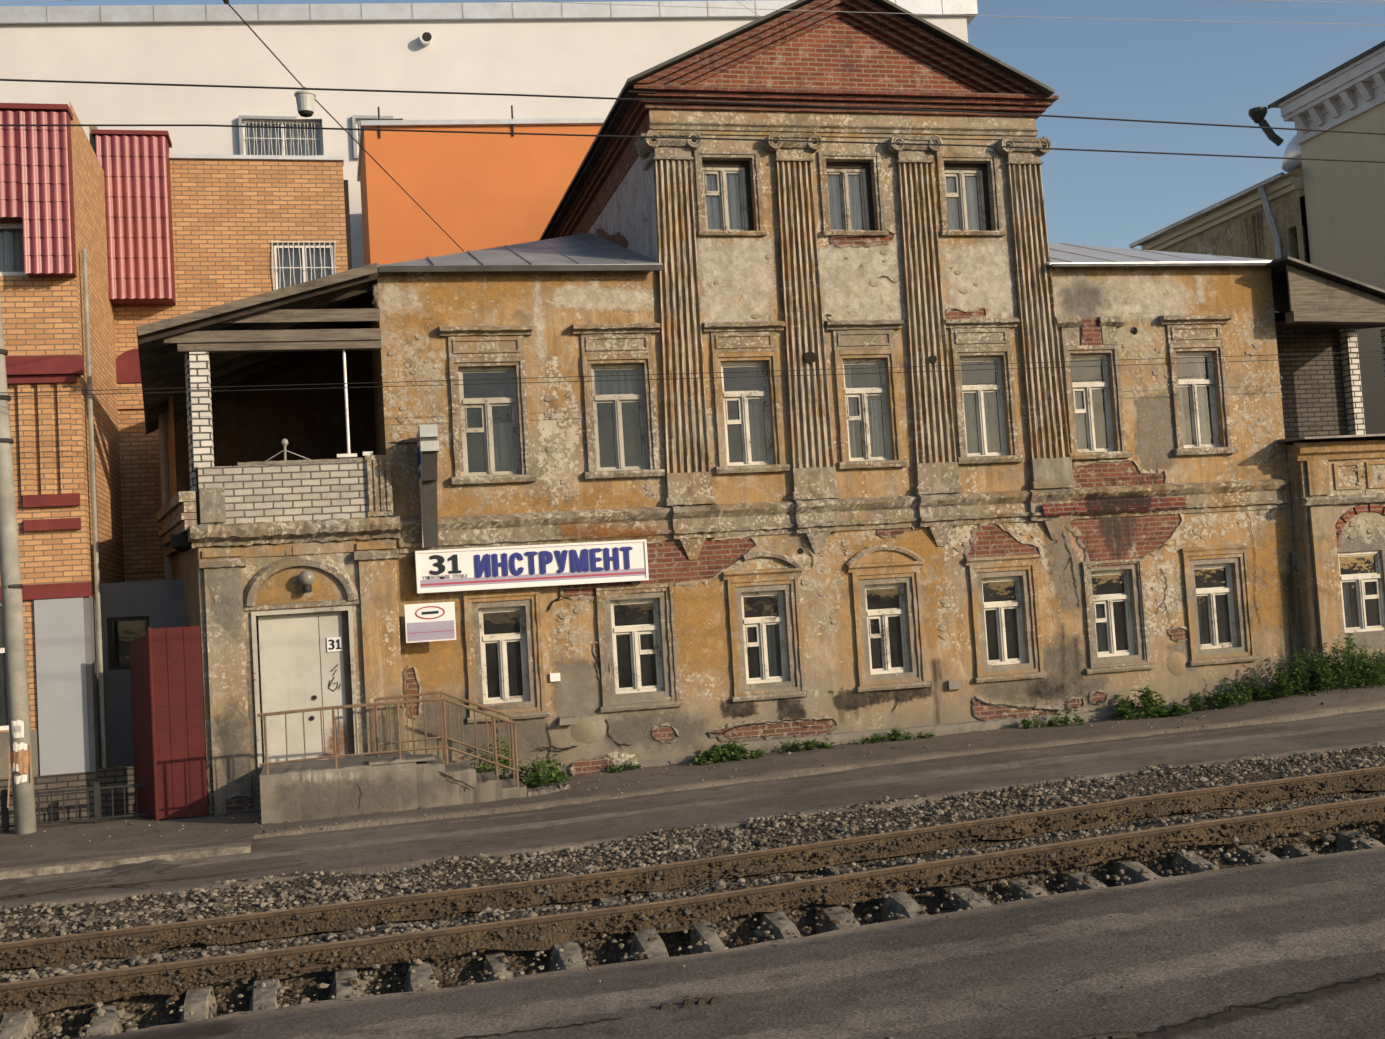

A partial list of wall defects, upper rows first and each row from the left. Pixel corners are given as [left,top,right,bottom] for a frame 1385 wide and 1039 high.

flaking render [943,241,1017,319]
peeling [1342,516,1385,544]
flaking render [934,458,1281,650]
flaking render [552,526,915,682]
spalling [971,690,1109,721]
spalling [651,722,679,744]
spalling [708,715,838,742]